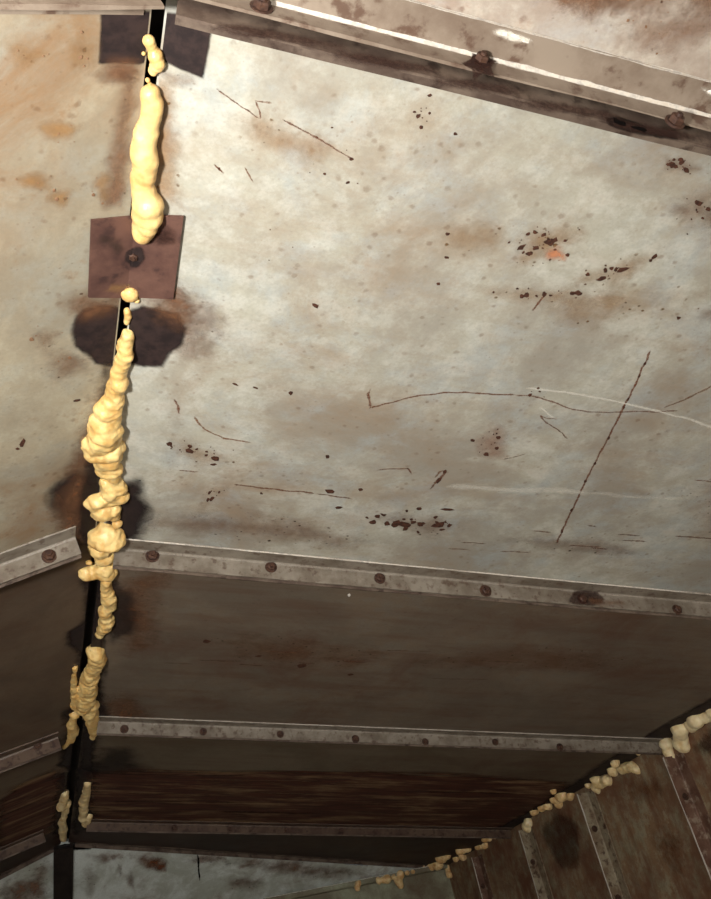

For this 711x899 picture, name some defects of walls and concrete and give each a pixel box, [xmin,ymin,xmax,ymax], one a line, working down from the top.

corrosion [216,25,702,140]
corrosion [508,226,570,266]
corrosion [59,453,99,539]
corrosion [365,507,453,535]